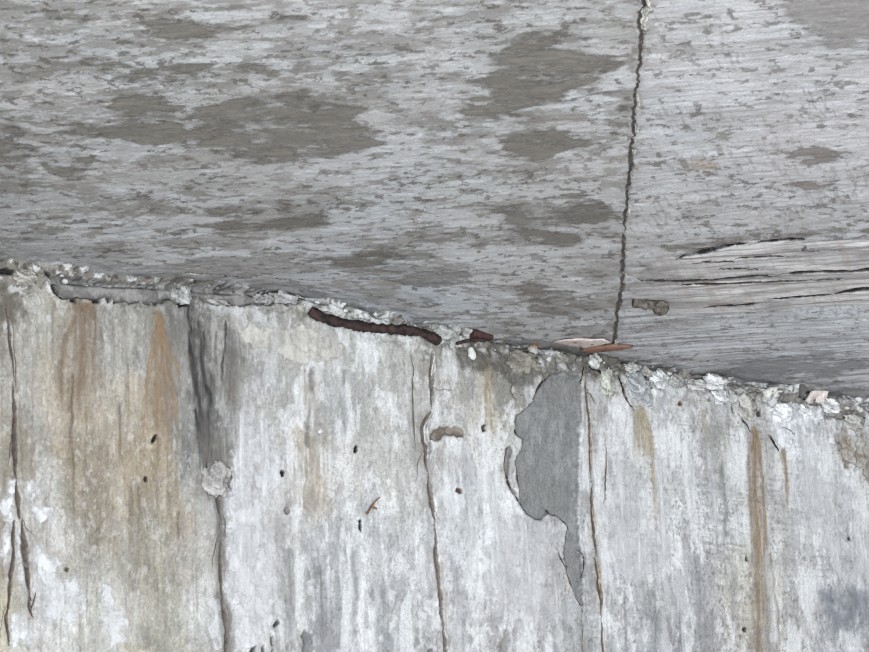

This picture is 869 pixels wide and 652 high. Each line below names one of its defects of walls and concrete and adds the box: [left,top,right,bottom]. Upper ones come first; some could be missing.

leakage [71,52,385,164]
leakage [460,31,623,119]
crack [612,0,869,344]
spalling [44,272,300,308]
spalling [307,307,442,346]
leakage [0,480,24,582]
crack [1,309,36,646]
leakage [206,414,291,652]
crack [410,351,451,652]
spalling [504,371,583,605]
crack [504,366,632,652]
rust [748,427,767,616]